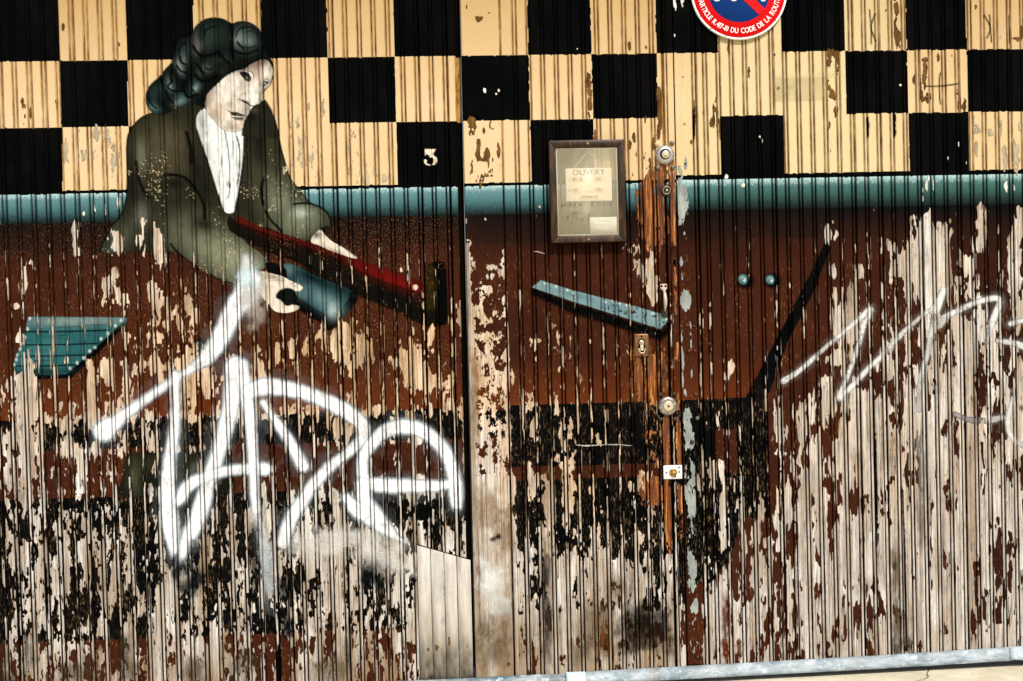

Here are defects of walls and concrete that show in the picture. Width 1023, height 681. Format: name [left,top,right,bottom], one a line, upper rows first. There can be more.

peeling [63,124,122,177]
peeling [283,99,325,185]
peeling [340,124,389,186]
peeling [467,116,500,189]
peeling [709,97,721,139]
peeling [826,48,839,130]
peeling [899,53,952,103]
peeling [957,89,1023,192]
peeling [0,196,1023,681]